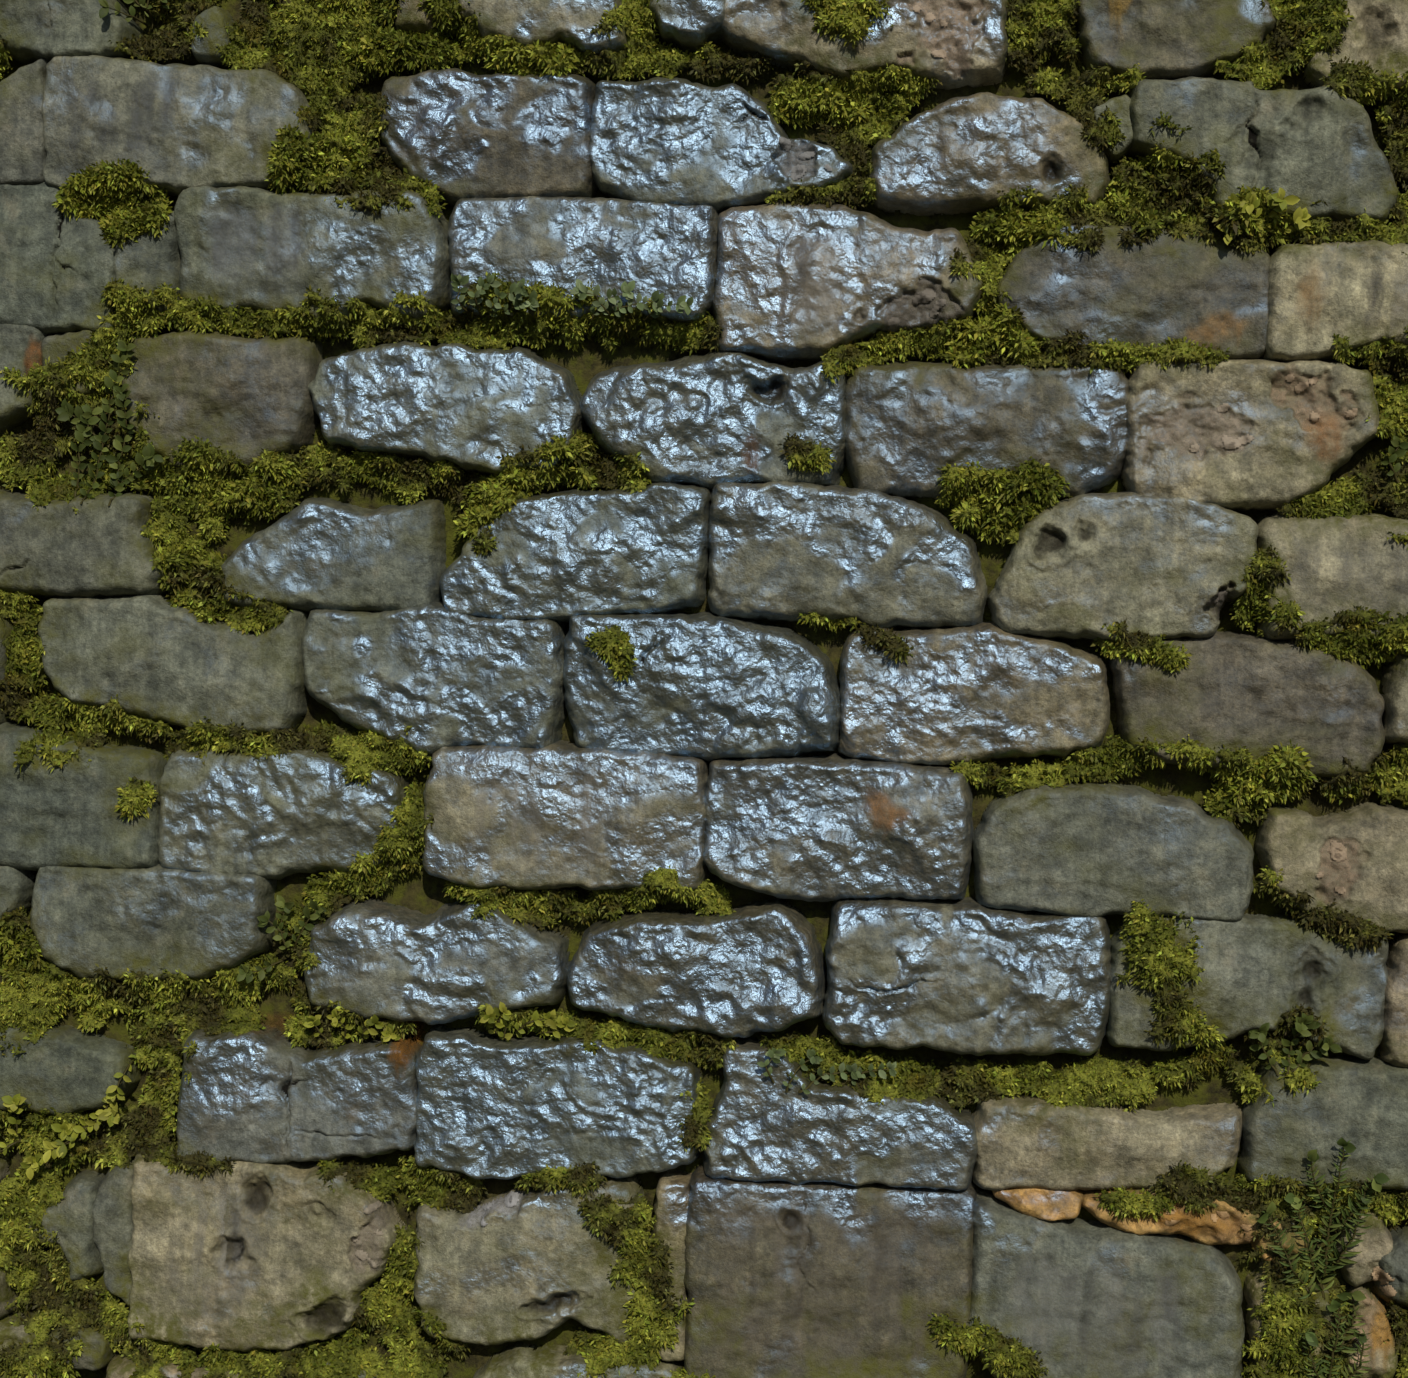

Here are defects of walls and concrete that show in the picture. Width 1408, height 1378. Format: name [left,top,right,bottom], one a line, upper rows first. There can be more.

crack [1245,120,1258,152]